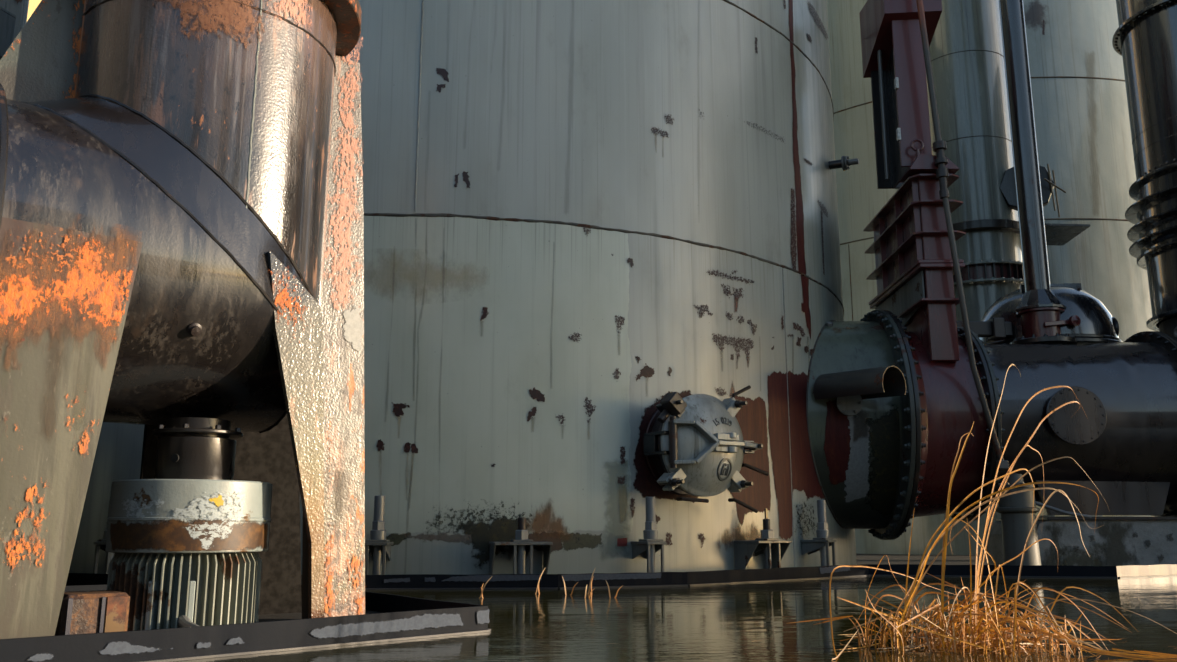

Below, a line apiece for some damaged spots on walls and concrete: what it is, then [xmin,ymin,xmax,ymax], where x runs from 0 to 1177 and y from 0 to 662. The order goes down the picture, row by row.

corrosion [148,0,312,54]
corrosion [323,37,364,315]
corrosion [0,225,137,366]
corrosion [271,267,311,343]
corrosion [0,478,52,572]
peeling [121,491,247,522]
damp [386,502,602,569]